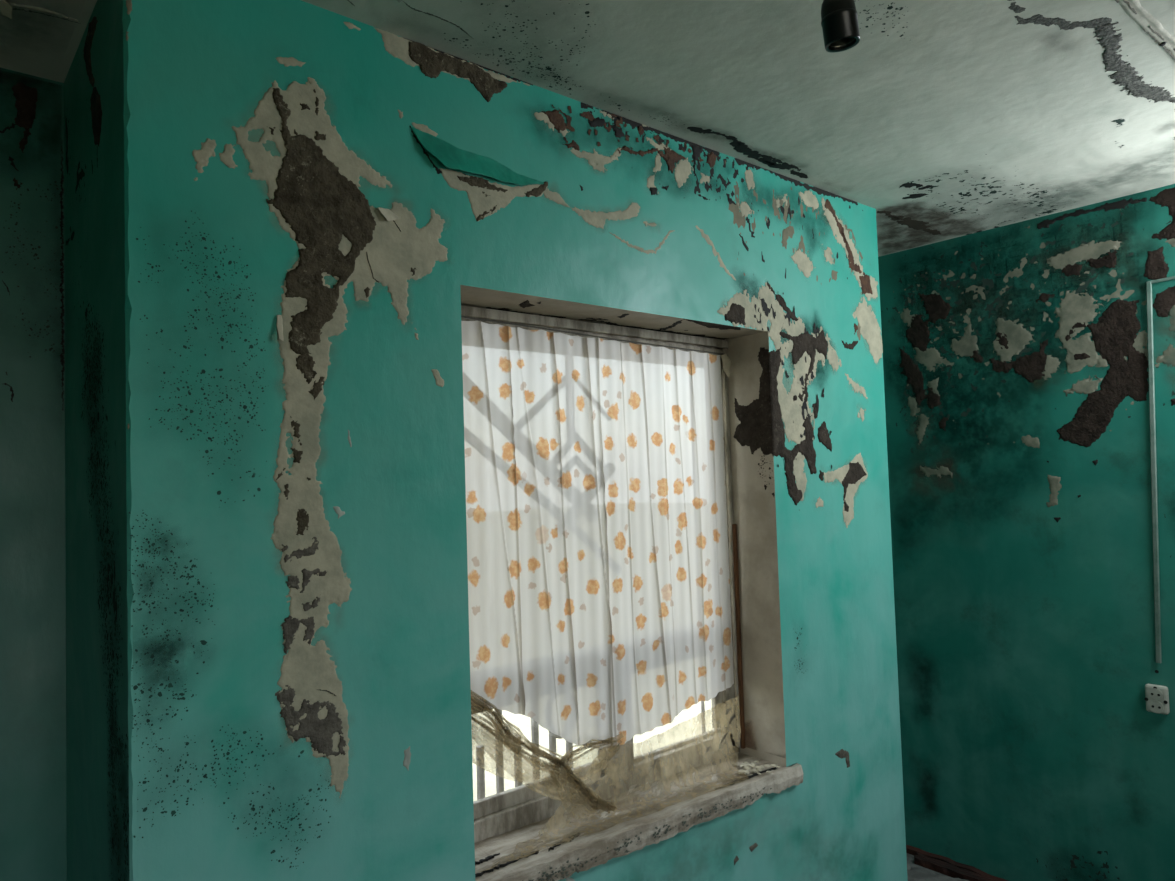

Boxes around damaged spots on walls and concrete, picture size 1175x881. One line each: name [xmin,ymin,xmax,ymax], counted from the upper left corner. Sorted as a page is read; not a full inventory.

spalling [83,16,102,174]
peeling [344,22,530,102]
crack [1008,0,1175,103]
leakage [136,210,269,501]
peeling [192,57,448,798]
peeling [534,105,1175,528]
leakage [72,295,331,881]